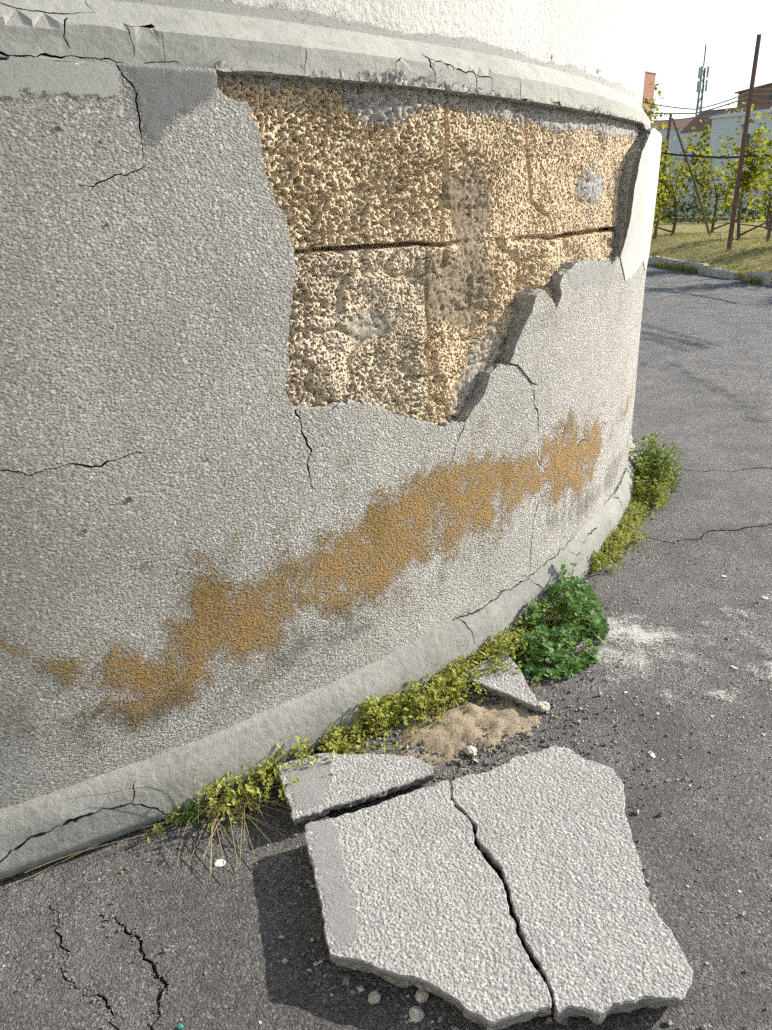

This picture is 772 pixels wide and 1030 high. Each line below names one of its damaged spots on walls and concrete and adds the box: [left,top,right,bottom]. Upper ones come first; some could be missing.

crack [0,0,179,187]
spalling [113,0,646,428]
crack [454,363,598,644]
crack [610,468,627,510]
crack [645,523,772,544]
crack [0,781,172,863]
crack [49,905,120,1030]
crack [99,914,172,1030]